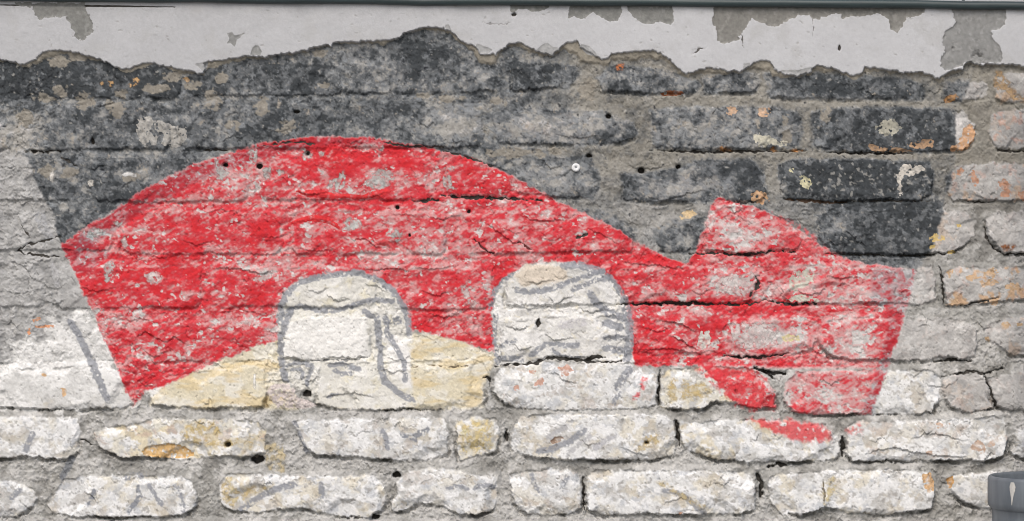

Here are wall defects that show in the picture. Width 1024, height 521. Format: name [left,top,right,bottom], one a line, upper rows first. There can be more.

flaking render [15,2,94,41]
flaking render [227,32,245,47]
flaking render [537,43,559,56]
flaking render [712,7,925,44]
flaking render [940,9,1007,71]
flaking render [781,67,812,76]
crack [17,224,61,258]